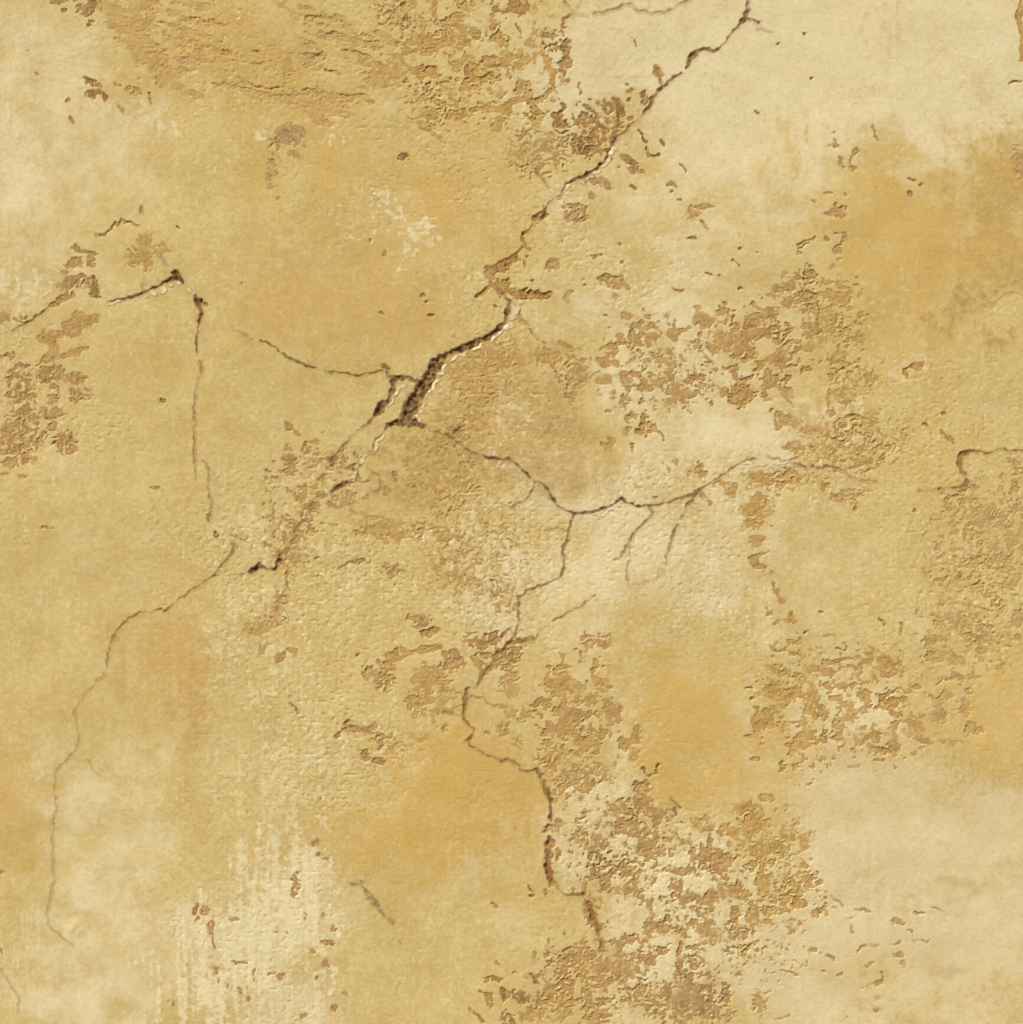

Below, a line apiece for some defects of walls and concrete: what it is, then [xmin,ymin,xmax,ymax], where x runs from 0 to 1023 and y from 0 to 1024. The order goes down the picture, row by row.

spalling [212,0,666,201]
crack [521,0,773,237]
spalling [827,132,860,172]
spalling [812,191,848,219]
crack [10,307,49,333]
spalling [0,243,101,479]
crack [917,446,1023,492]
crack [45,251,878,950]
spalling [262,232,1023,1024]
spalling [192,903,216,949]
spalling [232,961,285,982]